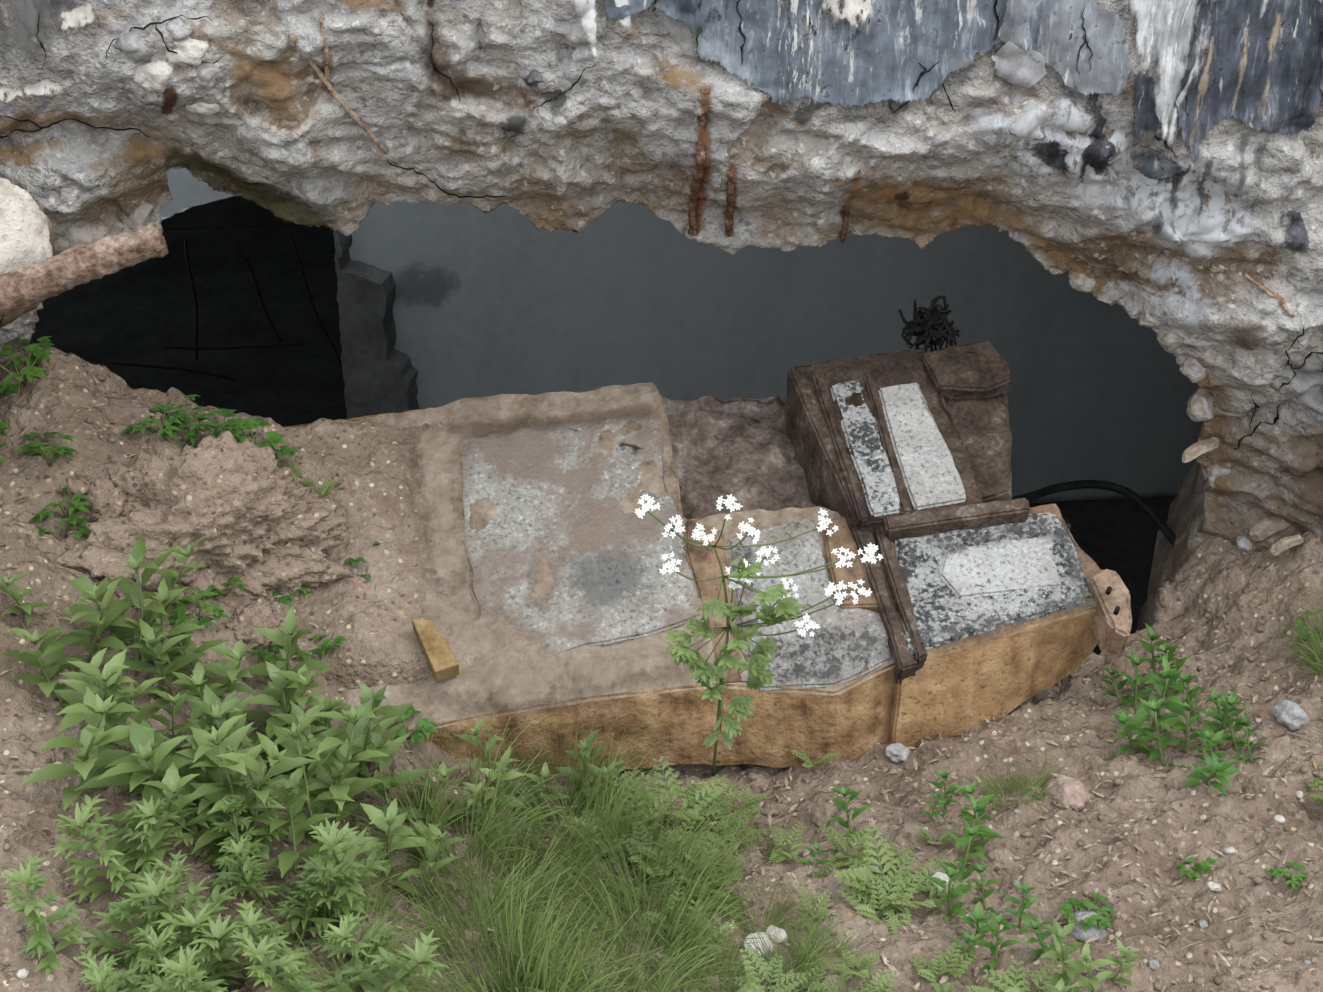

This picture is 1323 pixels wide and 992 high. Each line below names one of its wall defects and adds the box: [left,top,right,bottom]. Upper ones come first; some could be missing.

crack [104,14,218,67]
rust [425,0,450,76]
crack [0,115,149,138]
crack [387,159,506,198]
rust [655,60,711,229]
spalling [688,114,707,236]
spalling [725,169,735,237]
rust [725,163,737,224]
spalling [840,195,854,243]
peeling [604,0,1323,179]
rust [840,173,1103,286]
crack [1233,327,1323,450]